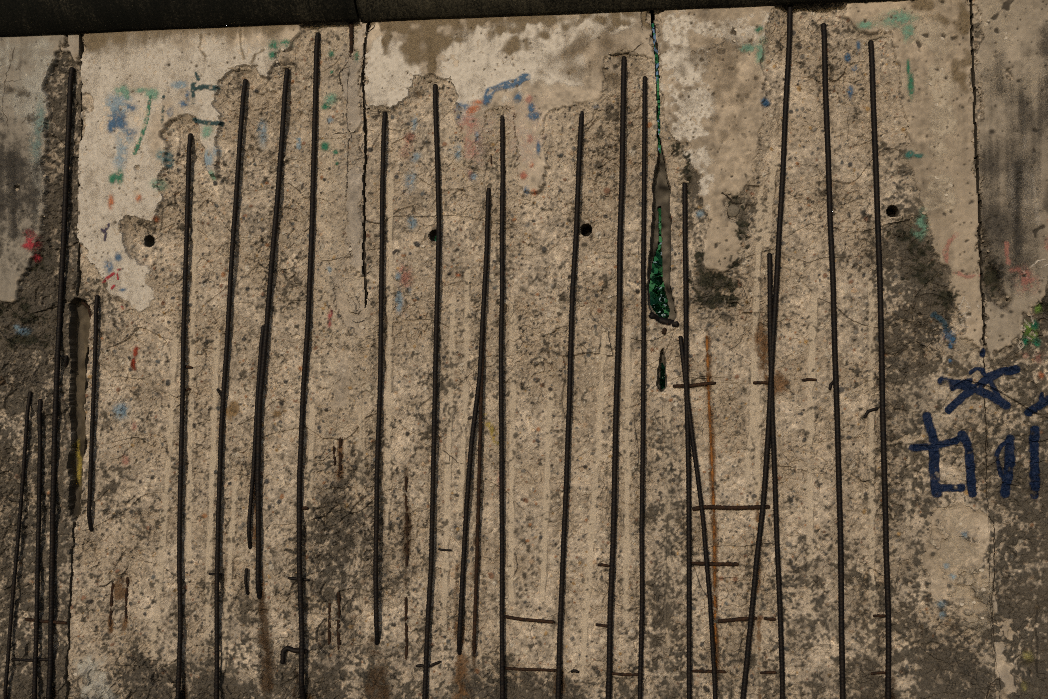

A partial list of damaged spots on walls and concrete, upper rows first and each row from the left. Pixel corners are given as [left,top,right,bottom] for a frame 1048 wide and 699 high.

water stain [0,117,50,251]
crack [333,25,375,188]
crack [351,244,374,323]
spalling [0,5,793,699]
spalling [771,0,1048,699]
water stain [978,75,1048,289]